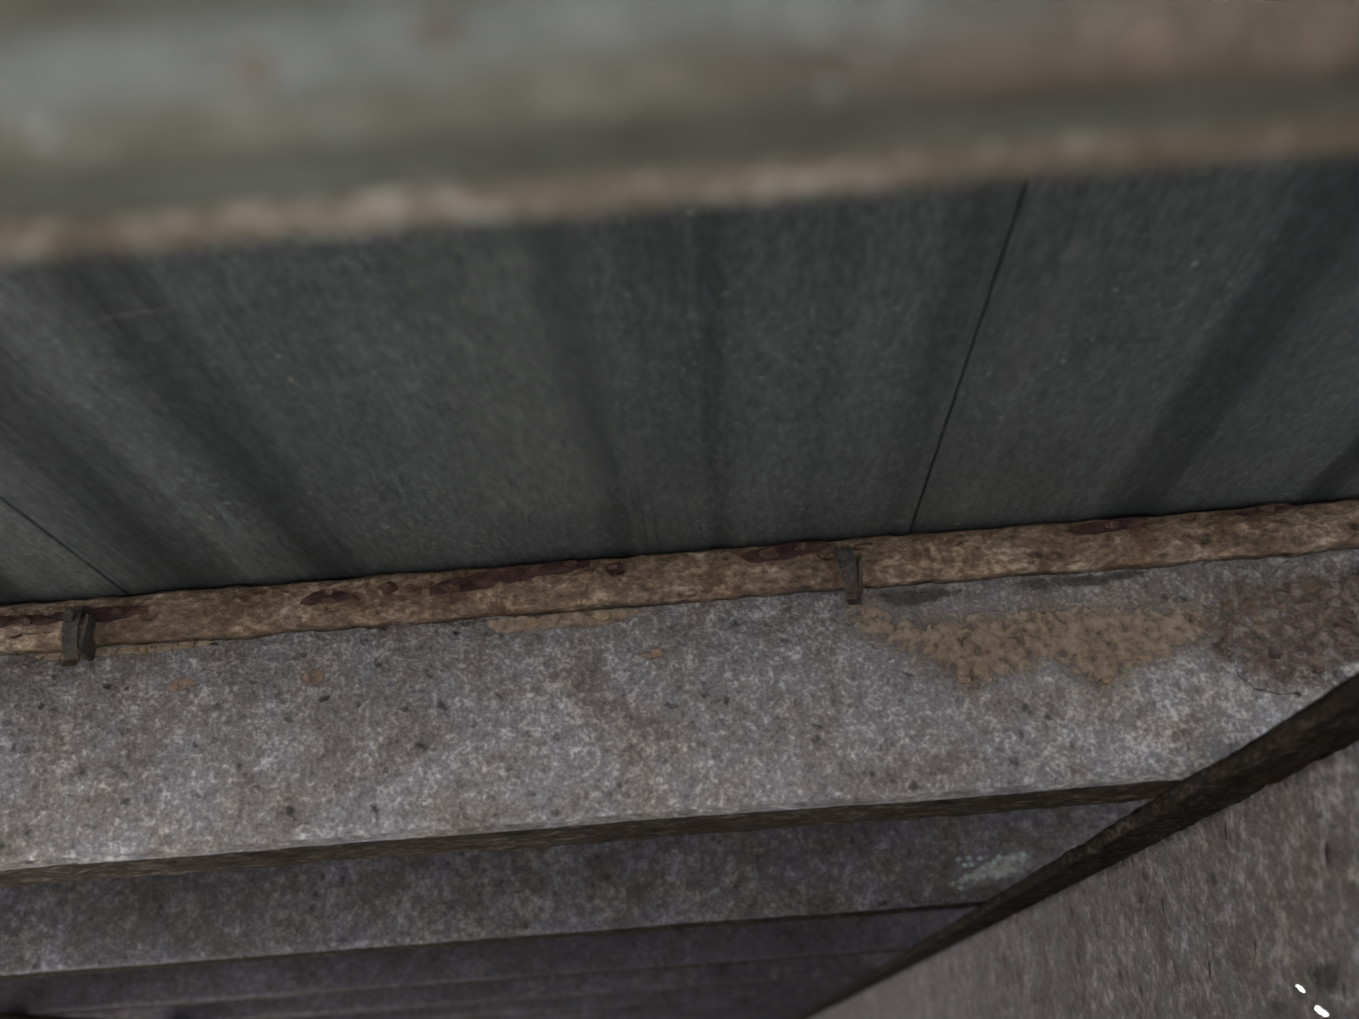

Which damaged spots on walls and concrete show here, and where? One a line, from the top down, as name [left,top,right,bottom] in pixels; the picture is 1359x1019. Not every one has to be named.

rust [1072,516,1147,535]
rust [741,541,829,563]
rust [430,560,623,595]
rust [300,589,359,613]
rust [0,612,63,639]
rust [81,606,148,622]
rust [846,563,1359,694]